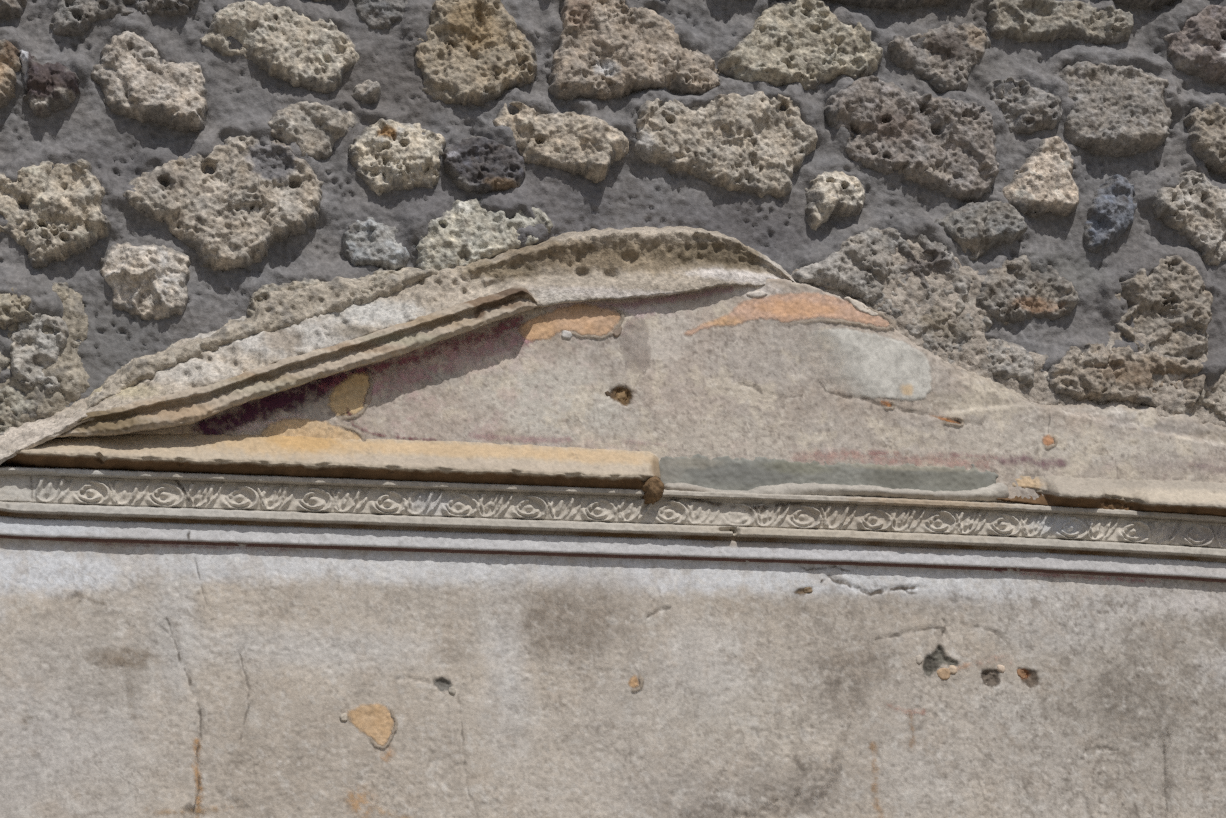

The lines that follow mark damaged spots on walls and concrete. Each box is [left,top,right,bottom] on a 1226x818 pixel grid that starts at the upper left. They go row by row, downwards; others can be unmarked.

flaking render [519,304,624,340]
flaking render [685,291,896,335]
flaking render [261,372,373,442]
spalling [605,387,632,405]
flaking render [938,417,964,427]
flaking render [1043,435,1058,449]
crack [804,566,916,595]
spalling [916,646,958,680]
spalling [981,665,1039,687]
flaking render [339,704,398,749]